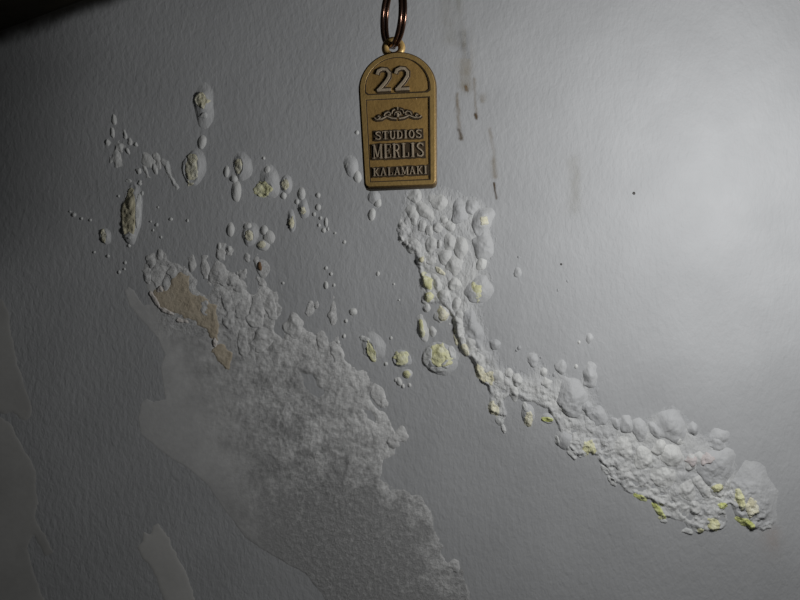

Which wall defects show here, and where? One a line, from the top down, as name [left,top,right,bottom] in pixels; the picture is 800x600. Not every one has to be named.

peeling [125,243,471,600]